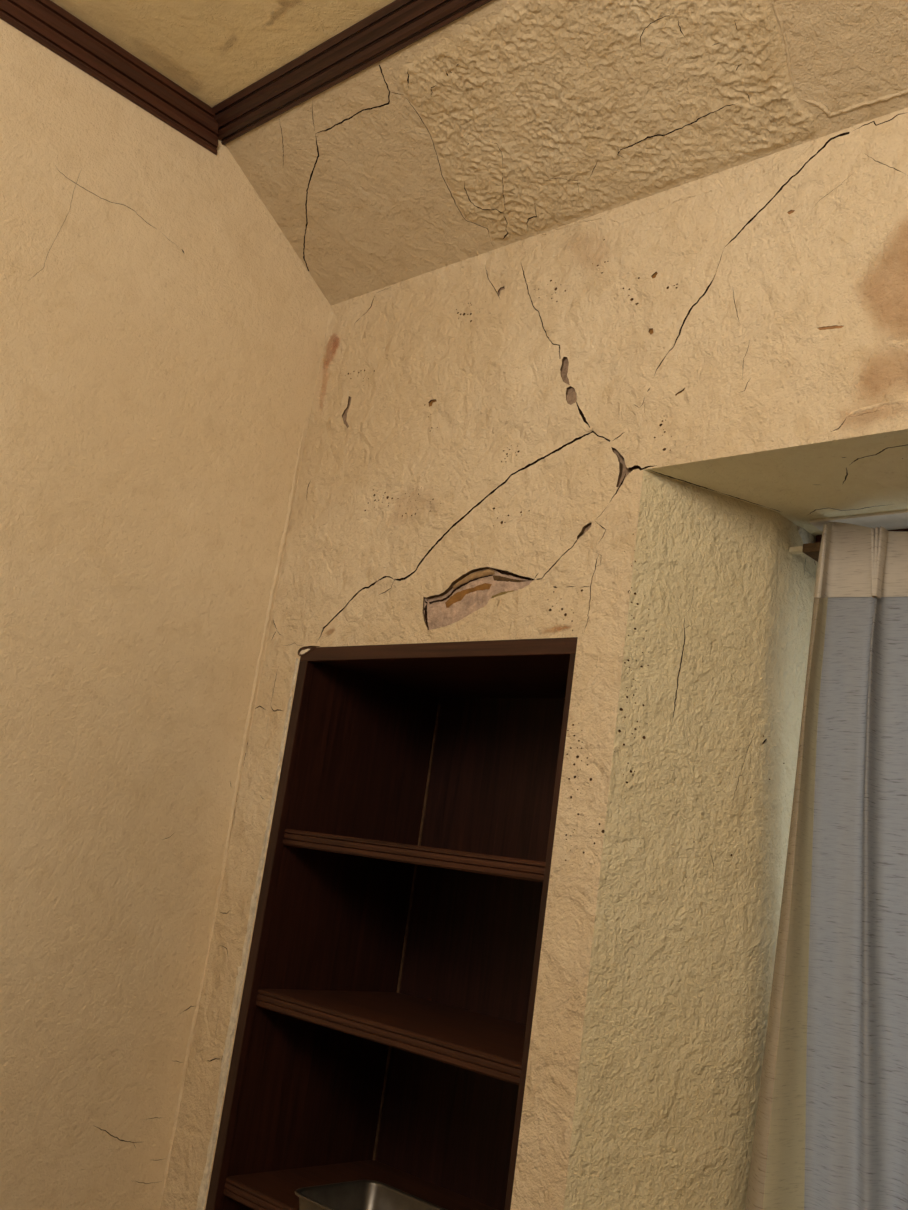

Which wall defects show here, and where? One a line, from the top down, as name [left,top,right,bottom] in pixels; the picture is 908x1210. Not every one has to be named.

crack [640,13,737,49]
crack [303,64,750,296]
crack [521,263,560,356]
crack [635,112,908,408]
crack [273,402,623,646]
flaking render [423,567,534,630]
crack [672,585,695,723]
crack [536,411,906,632]